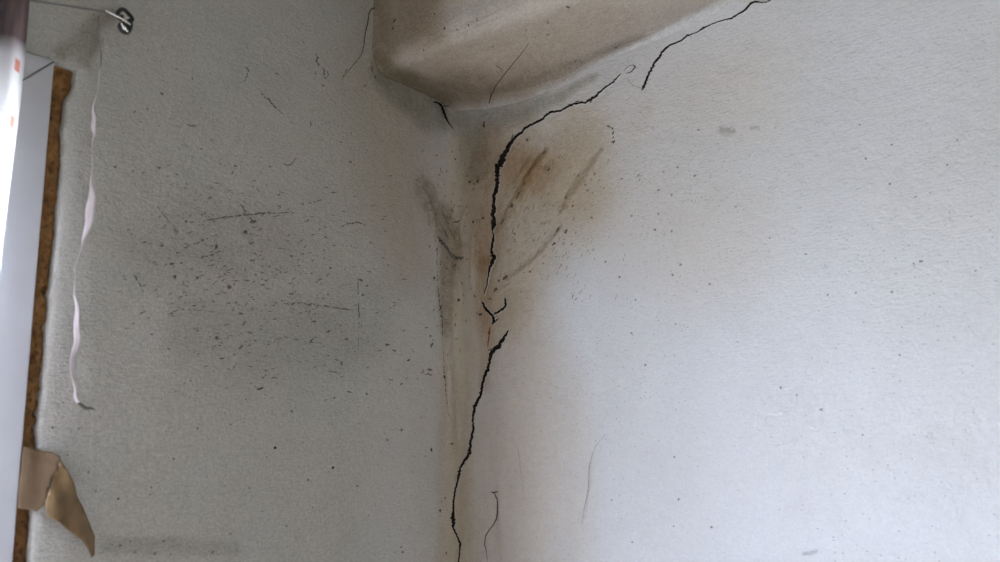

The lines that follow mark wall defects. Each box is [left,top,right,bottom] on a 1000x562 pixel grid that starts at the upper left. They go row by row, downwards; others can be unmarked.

crack [434,101,453,128]
crack [450,0,774,562]